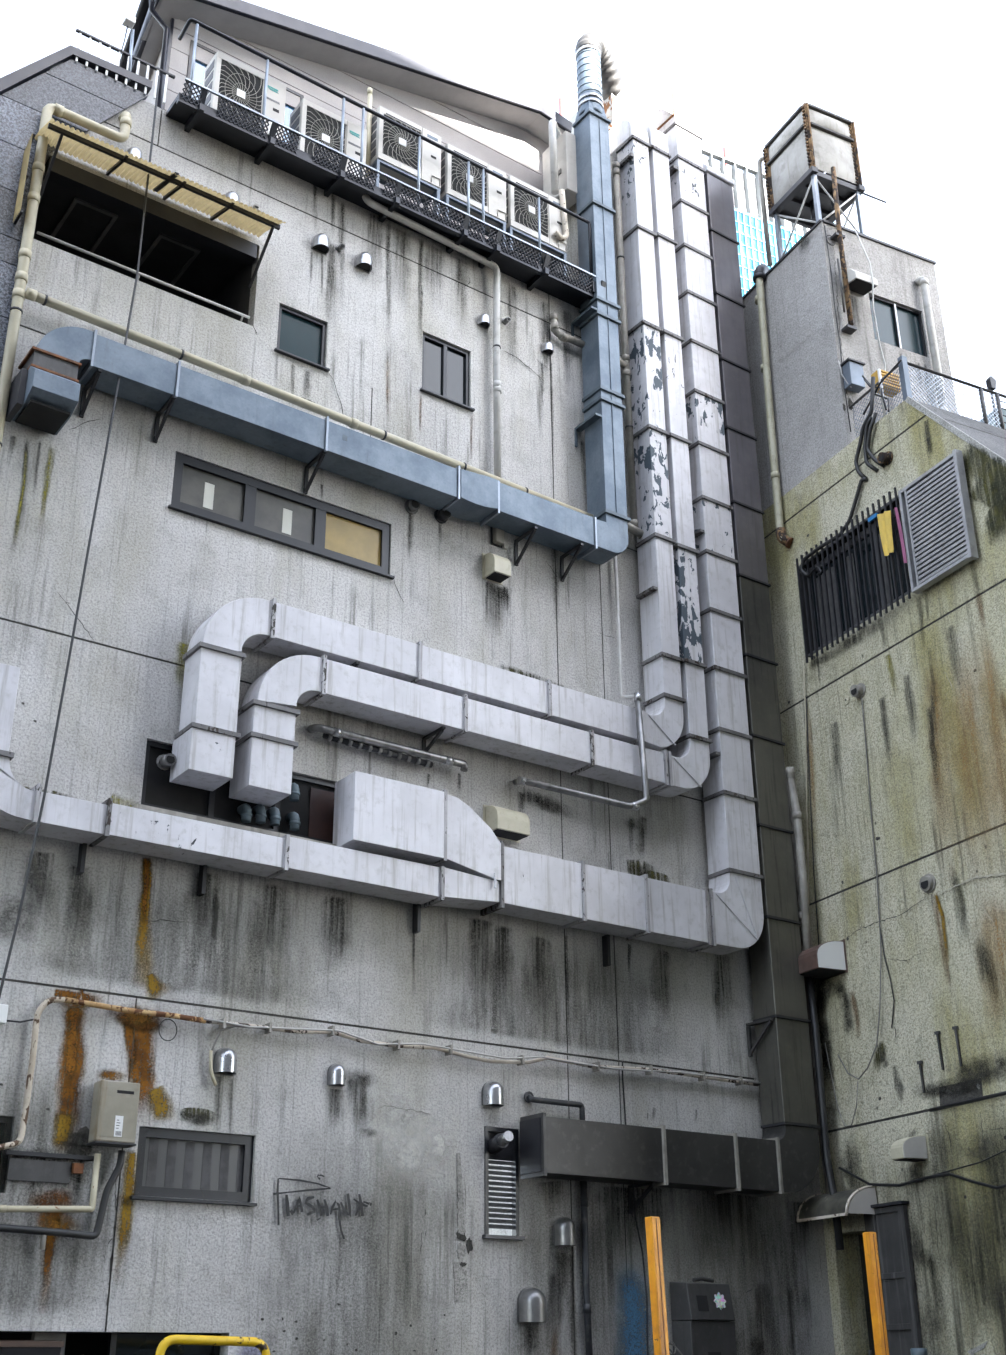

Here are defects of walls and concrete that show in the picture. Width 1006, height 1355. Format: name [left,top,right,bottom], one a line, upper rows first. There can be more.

leakage [10,437,54,532]
leakage [963,444,1006,539]
corrosion [54,859,206,1146]
leakage [196,873,218,937]
leakage [264,885,285,940]
leakage [325,897,345,949]
leakage [471,919,509,989]
leakage [533,938,549,991]
corrosion [935,894,948,963]
leakage [978,910,1006,997]
corrosion [118,1152,136,1252]
leakage [911,1132,1006,1310]